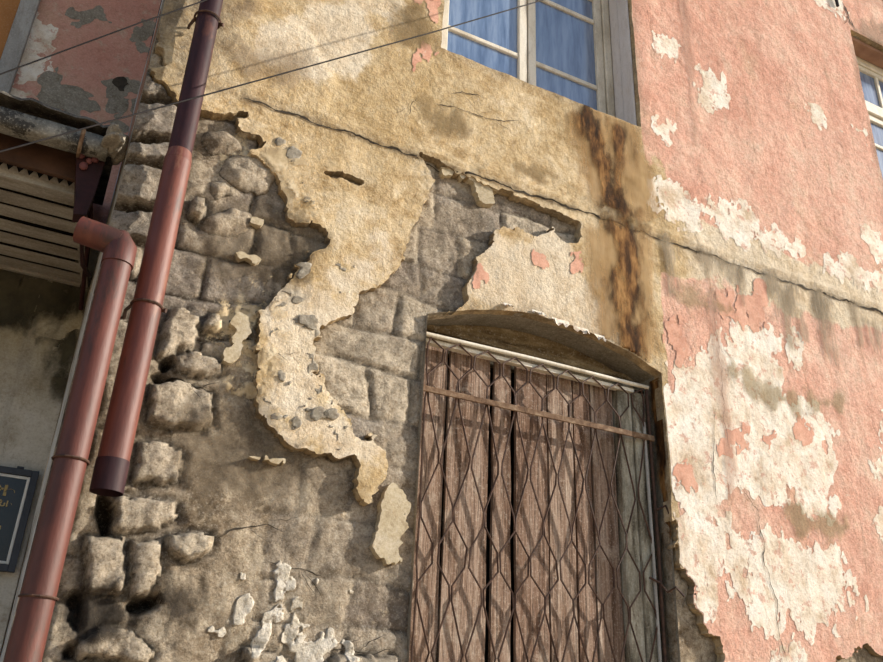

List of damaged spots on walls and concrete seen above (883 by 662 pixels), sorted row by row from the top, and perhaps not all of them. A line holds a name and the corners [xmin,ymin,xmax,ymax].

crack [436,91,518,129]
peeling [693,63,731,114]
damp [0,269,90,330]
damp [47,329,78,399]
spalling [3,9,584,662]
crack [245,98,883,315]
corrosion [569,105,654,360]
damp [699,248,745,304]
peeling [651,175,806,261]
damp [765,271,808,349]
peeling [823,223,883,293]
peeling [659,278,869,662]